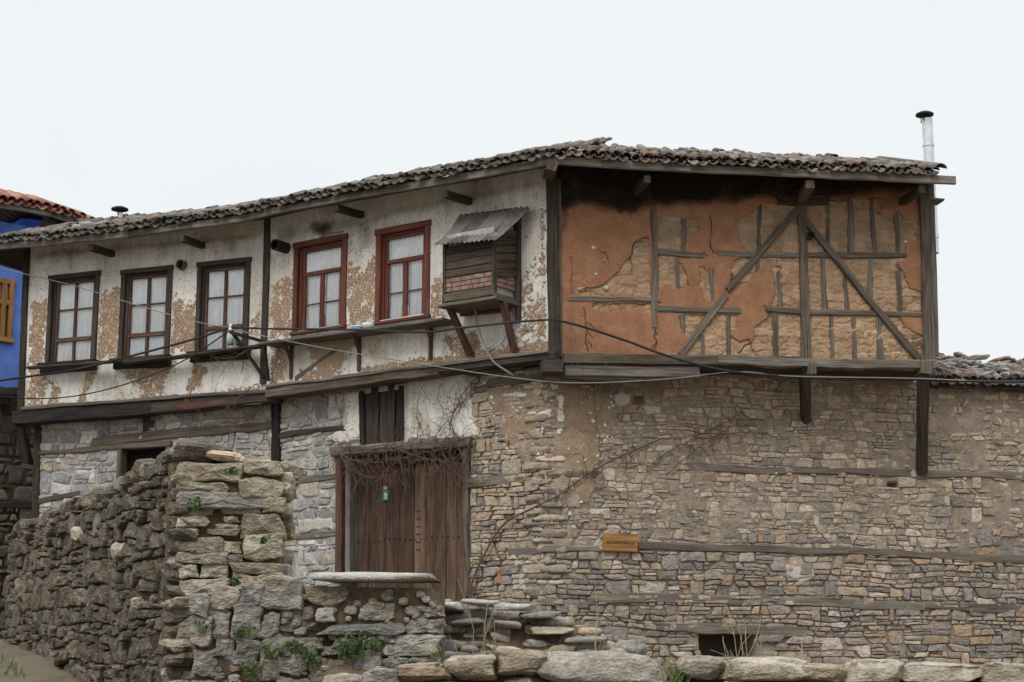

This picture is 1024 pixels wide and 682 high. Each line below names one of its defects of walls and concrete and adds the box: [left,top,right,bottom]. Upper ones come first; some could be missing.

peeling [24,267,355,407]
peeling [347,256,375,326]
peeling [361,208,548,372]
flaking render [577,215,714,316]
flaking render [685,198,924,360]
peeling [407,375,614,471]